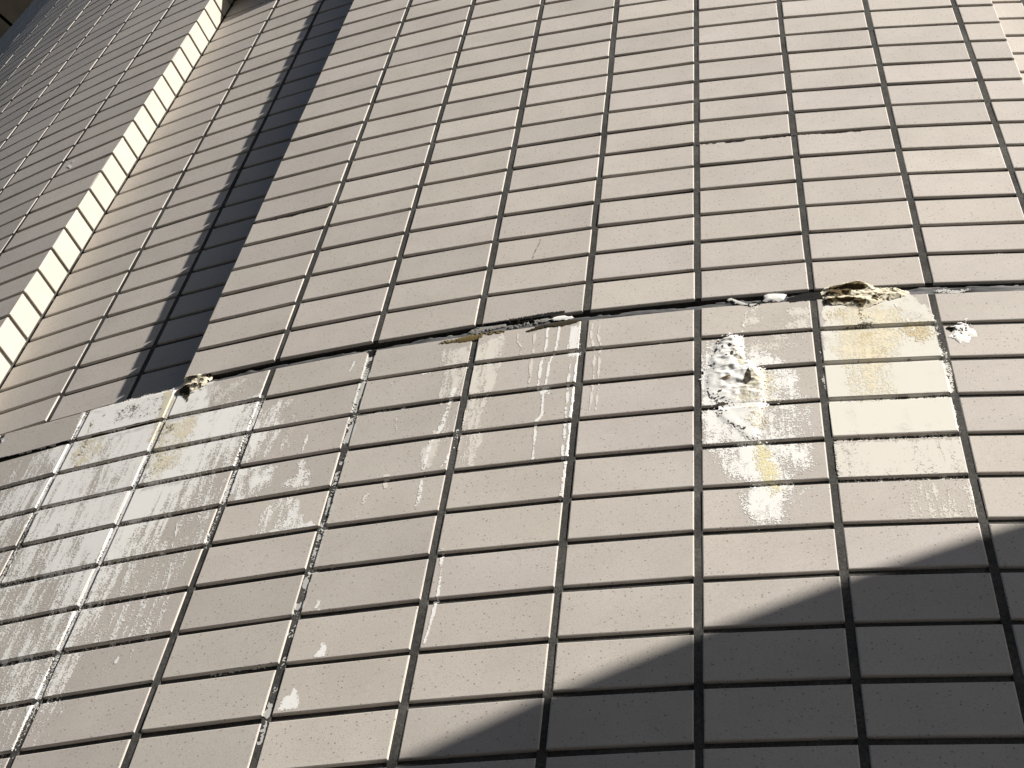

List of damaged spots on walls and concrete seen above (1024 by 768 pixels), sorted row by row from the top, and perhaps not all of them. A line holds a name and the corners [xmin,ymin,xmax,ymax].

spalling [176,373,212,401]
damp [415,323,602,507]
crack [483,310,565,326]
damp [692,290,984,526]
spalling [820,280,910,310]
damp [0,355,406,767]